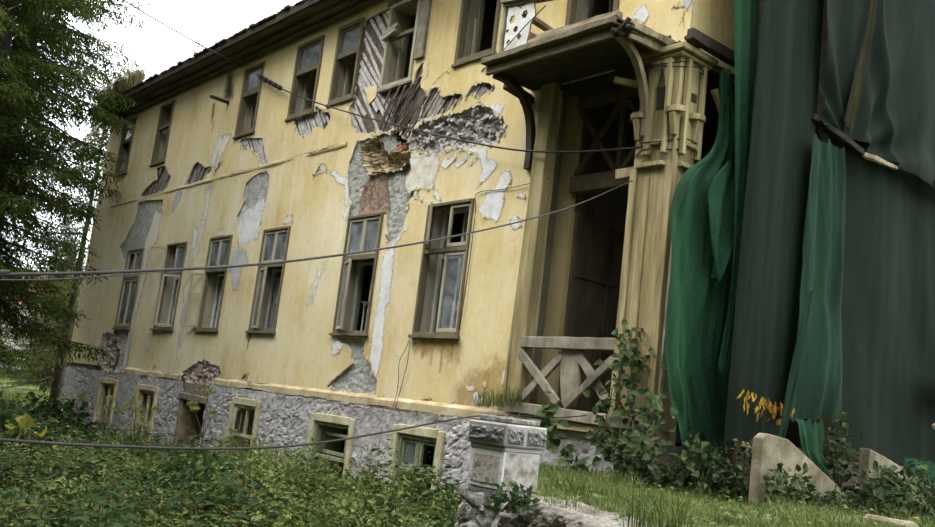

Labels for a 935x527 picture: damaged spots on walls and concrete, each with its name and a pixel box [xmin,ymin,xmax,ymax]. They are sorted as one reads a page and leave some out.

flaking render [121,160,213,262]
flaking render [227,136,270,291]
flaking render [328,80,522,395]
spalling [182,357,221,392]